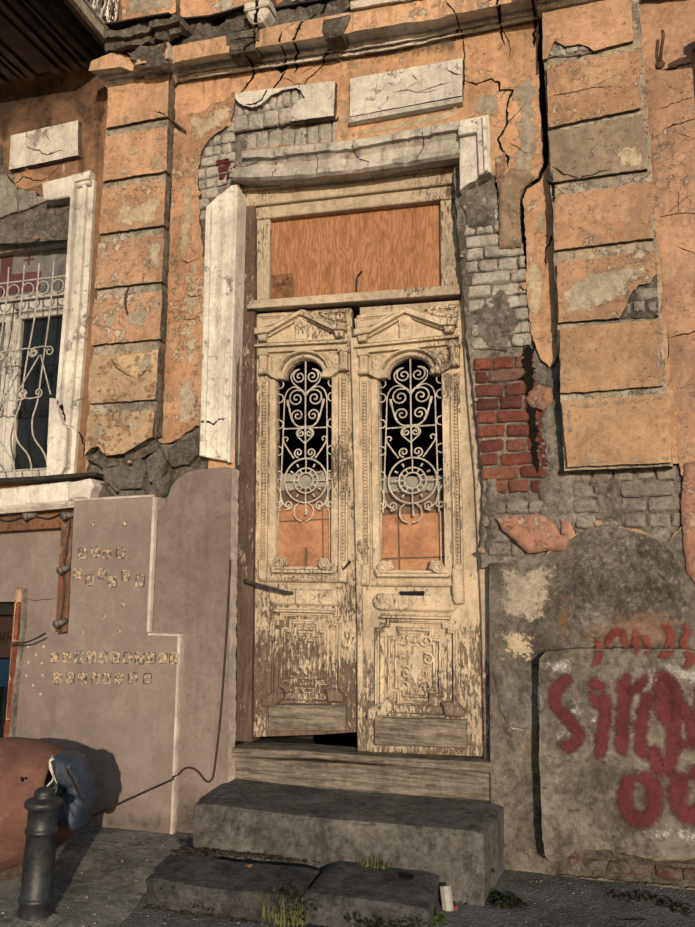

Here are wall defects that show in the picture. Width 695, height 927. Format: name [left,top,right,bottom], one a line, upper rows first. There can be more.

crack [235,0,331,105]
crack [6,132,64,185]
spalling [0,144,70,244]
spalling [179,83,459,278]
crack [393,0,610,472]
peeling [617,145,642,168]
crack [657,96,695,137]
crack [659,187,695,217]
spalling [454,152,695,585]
spalling [86,379,211,503]
peeling [500,631,535,661]
spalling [555,849,695,887]